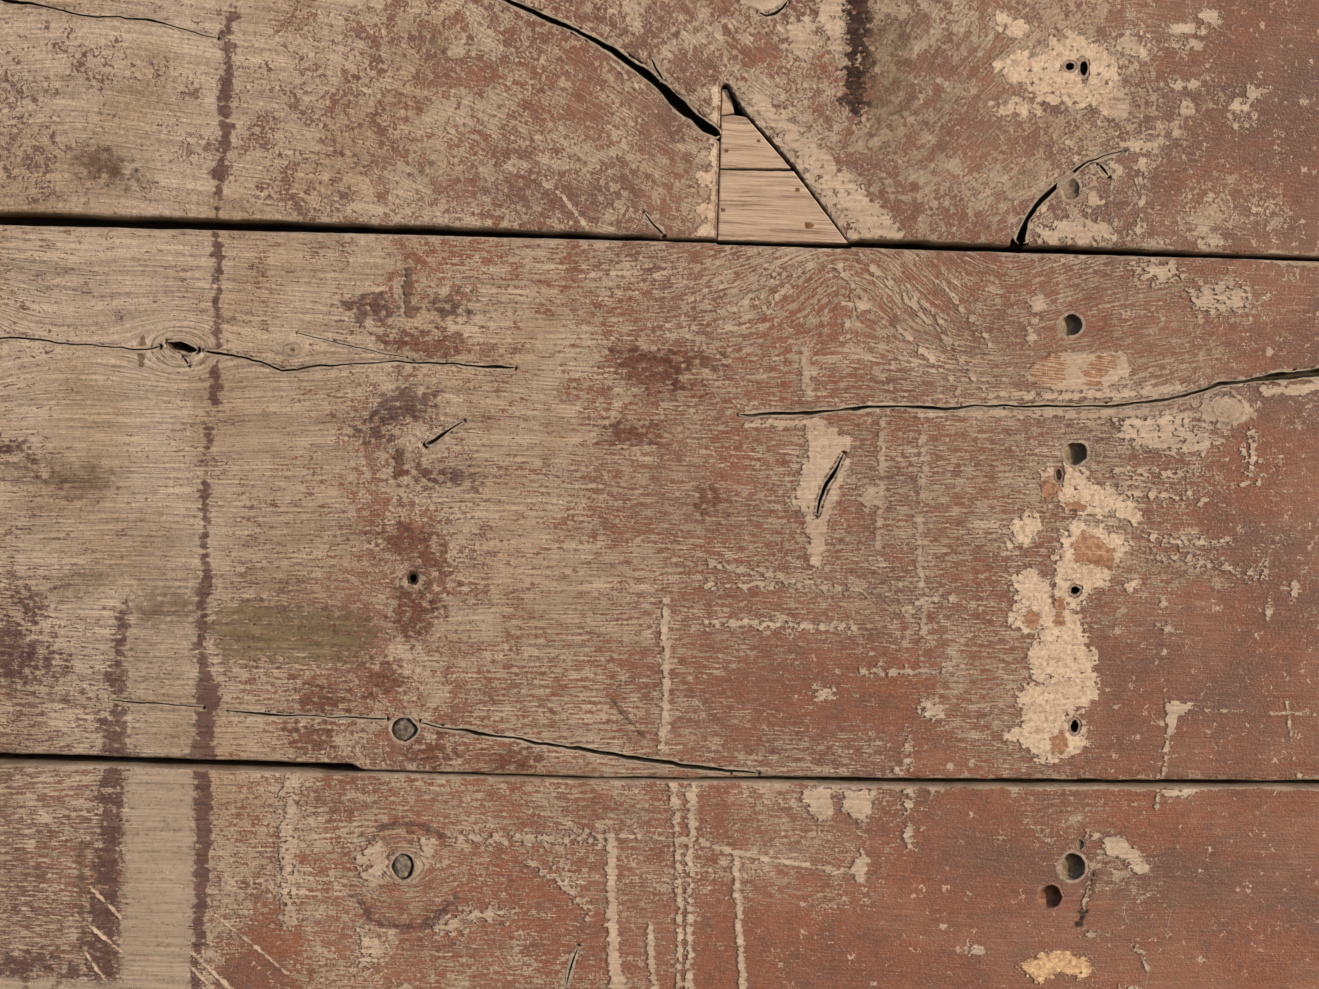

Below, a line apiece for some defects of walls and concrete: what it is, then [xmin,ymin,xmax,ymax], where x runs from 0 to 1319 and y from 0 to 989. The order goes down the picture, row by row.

crack [0,0,219,41]
crack [495,0,722,140]
peeling [987,4,1274,247]
crack [1012,148,1125,245]
peeling [686,79,1319,765]
crack [739,365,1319,420]
crack [813,452,845,516]
crack [420,718,758,776]
peeling [1131,699,1201,811]
peeling [801,785,881,827]
peeling [1082,828,1151,875]
peeling [1015,870,1110,985]